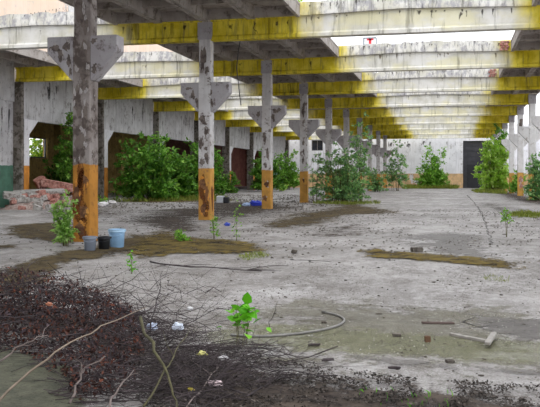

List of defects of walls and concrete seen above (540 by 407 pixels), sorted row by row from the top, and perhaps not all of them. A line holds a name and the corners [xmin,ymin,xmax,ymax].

peeling [49,0,97,162]
peeling [199,46,209,76]
peeling [185,87,210,167]
corrosion [70,162,87,239]